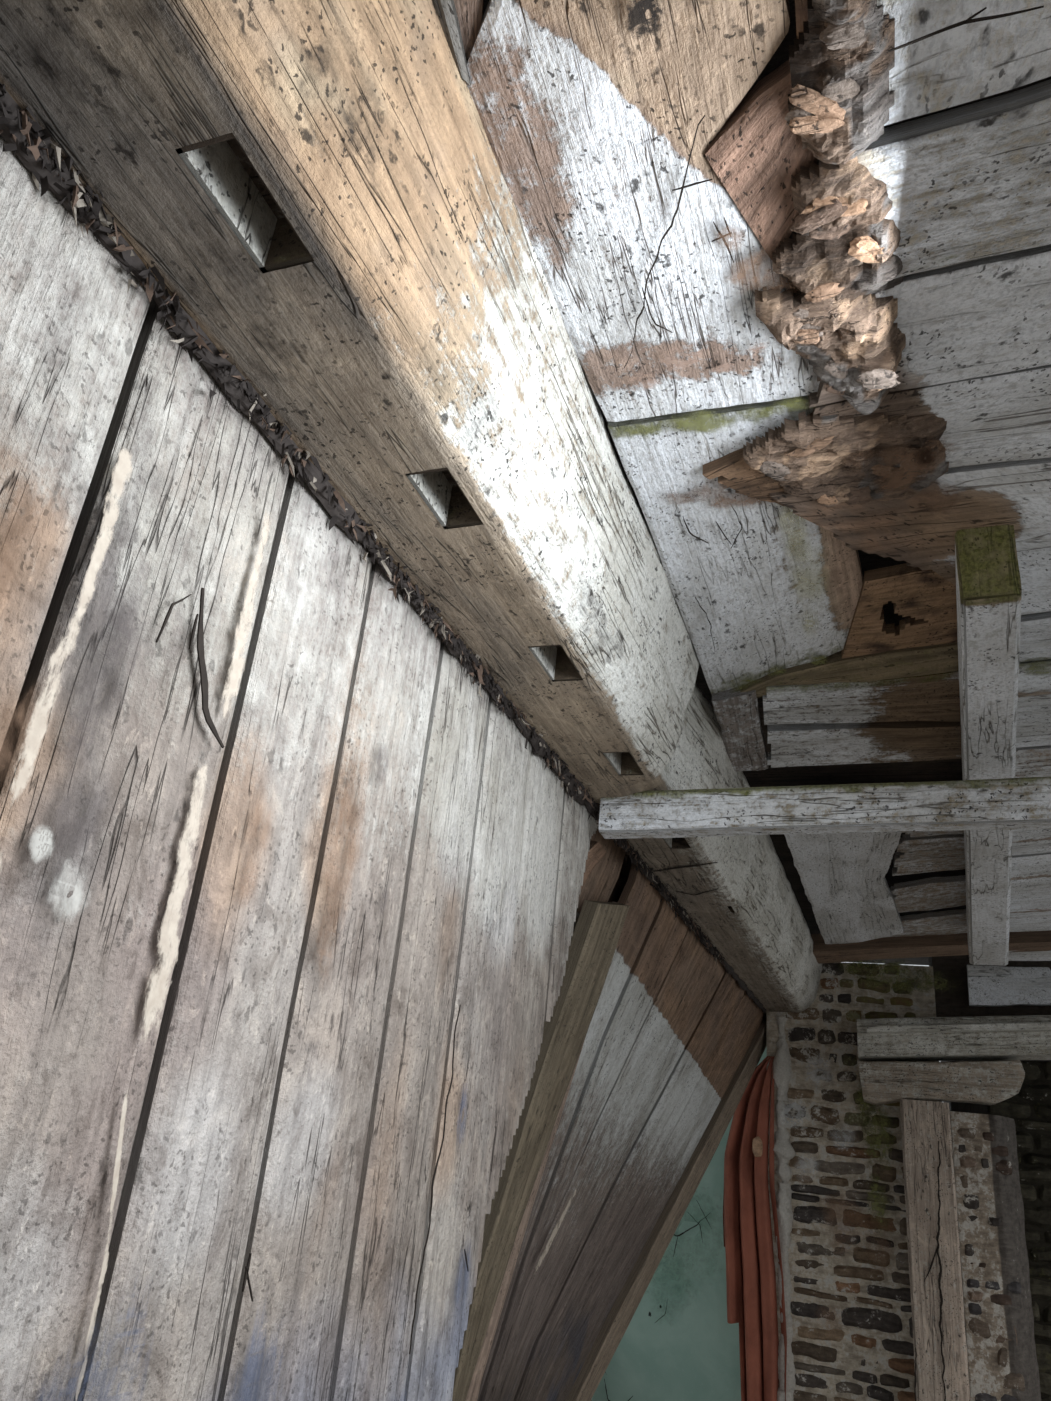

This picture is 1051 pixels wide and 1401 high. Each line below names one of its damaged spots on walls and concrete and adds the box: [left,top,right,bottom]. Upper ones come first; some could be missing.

damp [622,0,663,39]
peeling [819,20,866,50]
peeling [784,74,860,134]
peeling [790,196,884,263]
peeling [791,282,845,344]
peeling [824,360,900,389]
peeling [760,436,834,481]
crack [156,588,224,748]